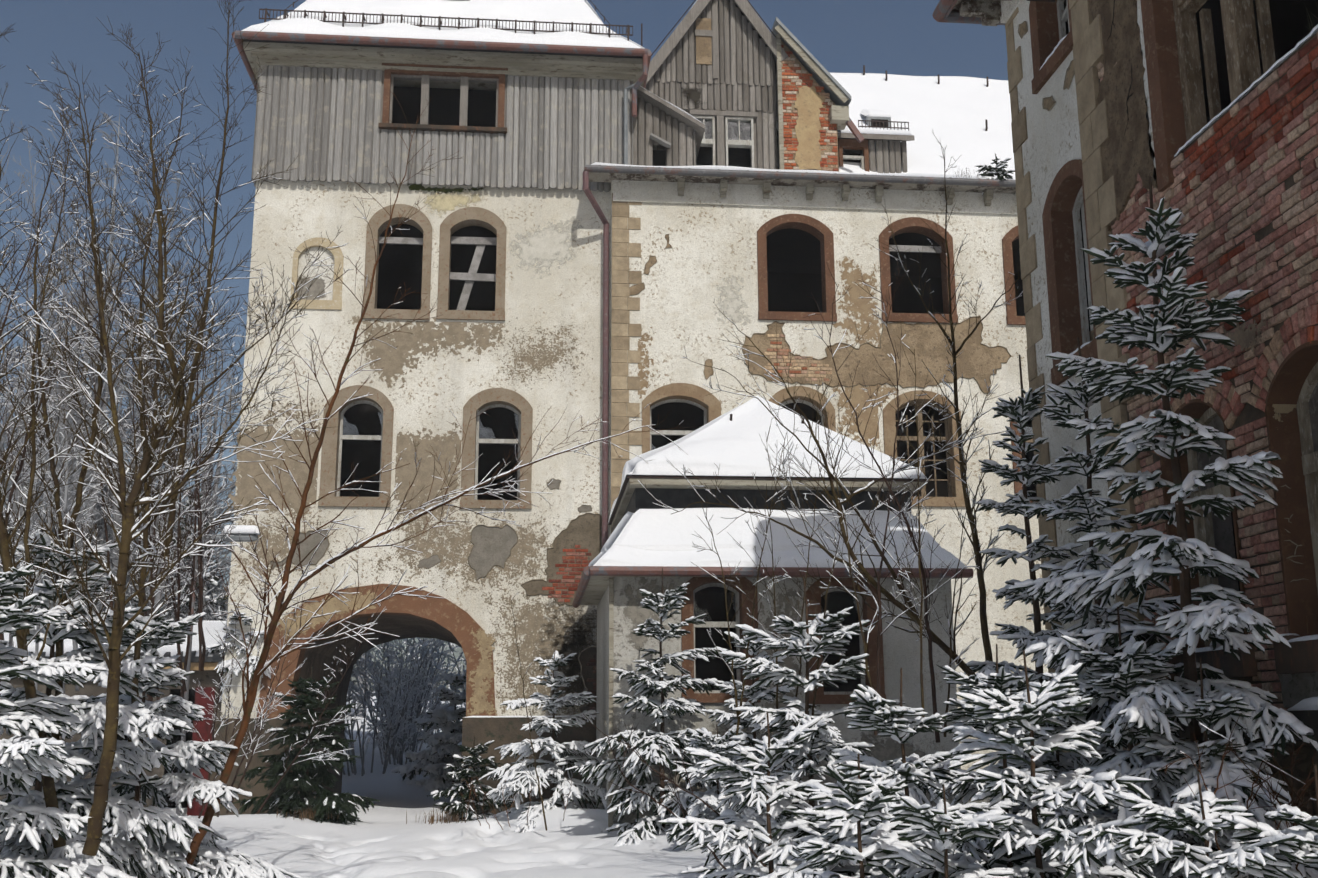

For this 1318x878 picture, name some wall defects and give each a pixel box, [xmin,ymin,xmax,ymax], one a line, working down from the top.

peeling [348,315,593,400]
spalling [741,252,1011,447]
peeling [219,384,348,611]
peeling [278,422,602,716]